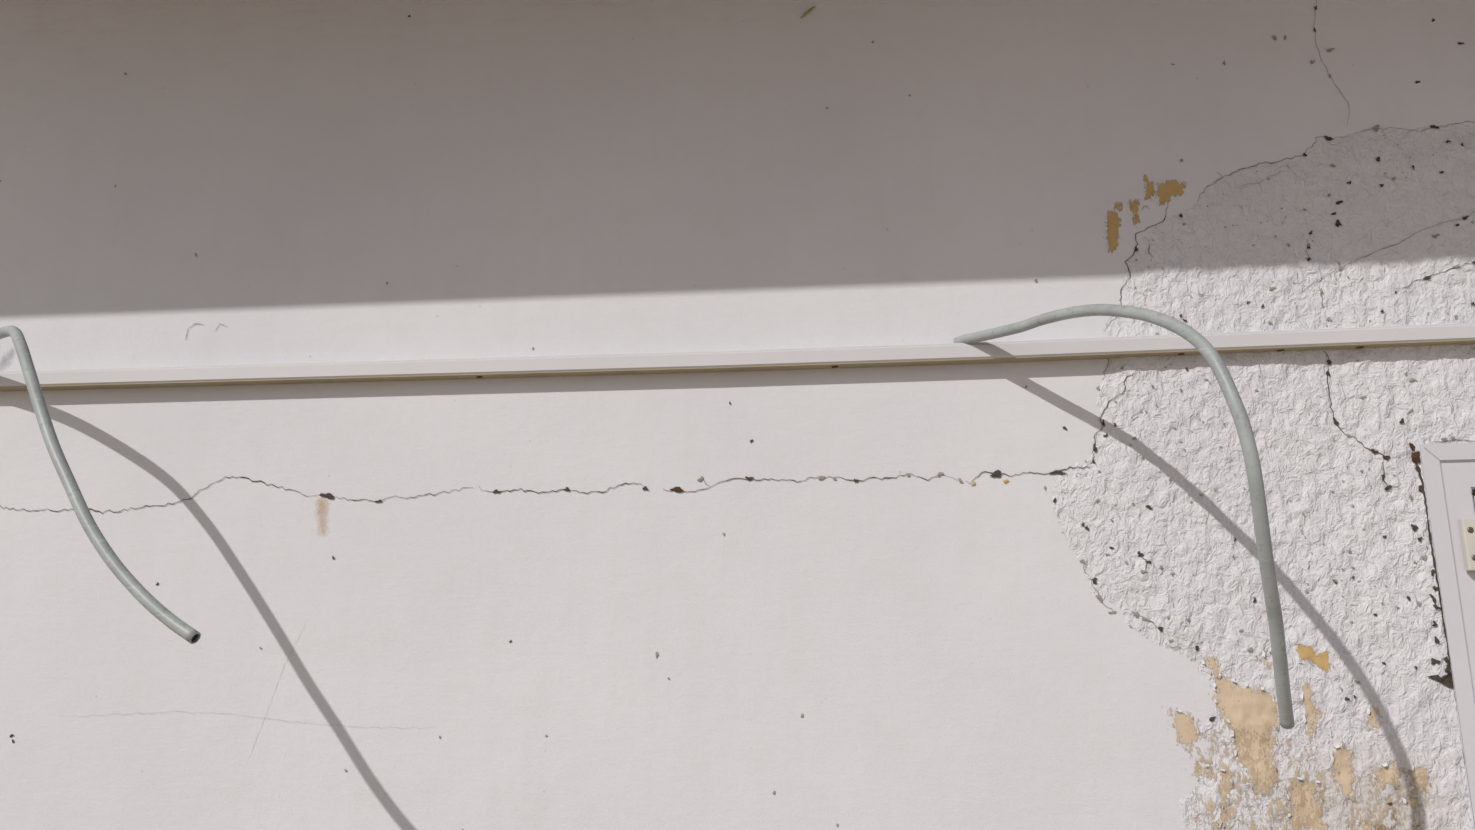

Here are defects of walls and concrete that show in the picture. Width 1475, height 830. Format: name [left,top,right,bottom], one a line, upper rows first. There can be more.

crack [0,0,1475,513]
peeling [1103,175,1186,253]
peeling [1167,629,1435,830]
crack [1325,352,1469,774]